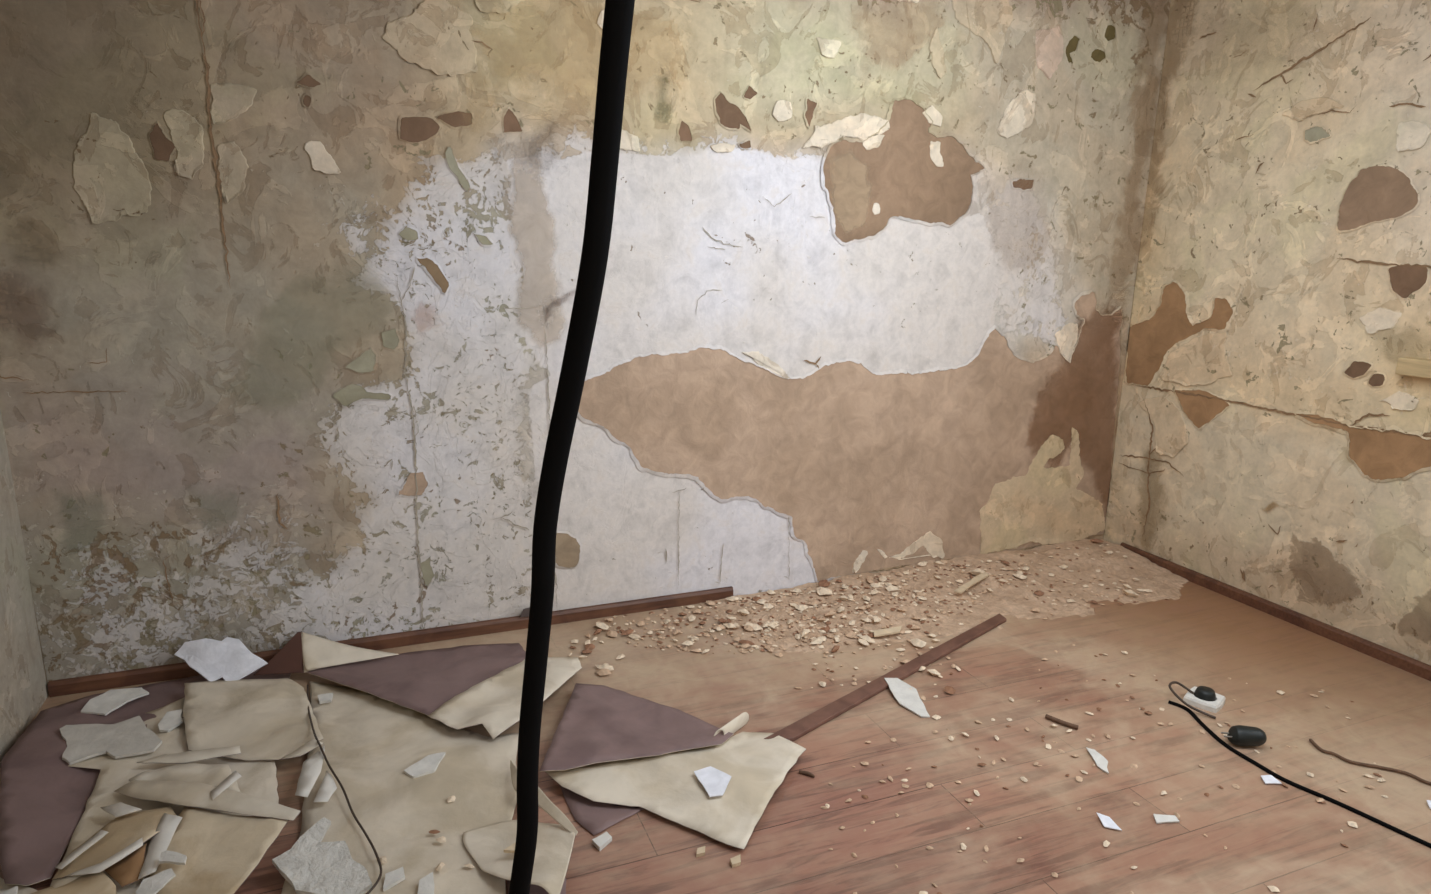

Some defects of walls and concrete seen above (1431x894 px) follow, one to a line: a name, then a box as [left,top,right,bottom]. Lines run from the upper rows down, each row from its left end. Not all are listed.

crack [1248,17,1371,97]
crack [196,0,230,285]
spalling [397,109,475,192]
peeling [620,130,640,152]
spalling [710,85,758,153]
flaking render [772,97,986,246]
flaking render [1336,121,1431,233]
crack [1389,101,1426,109]
flaking render [577,280,1237,582]
flaking render [1293,359,1431,482]
spalling [555,531,582,569]
flaking render [174,637,268,681]